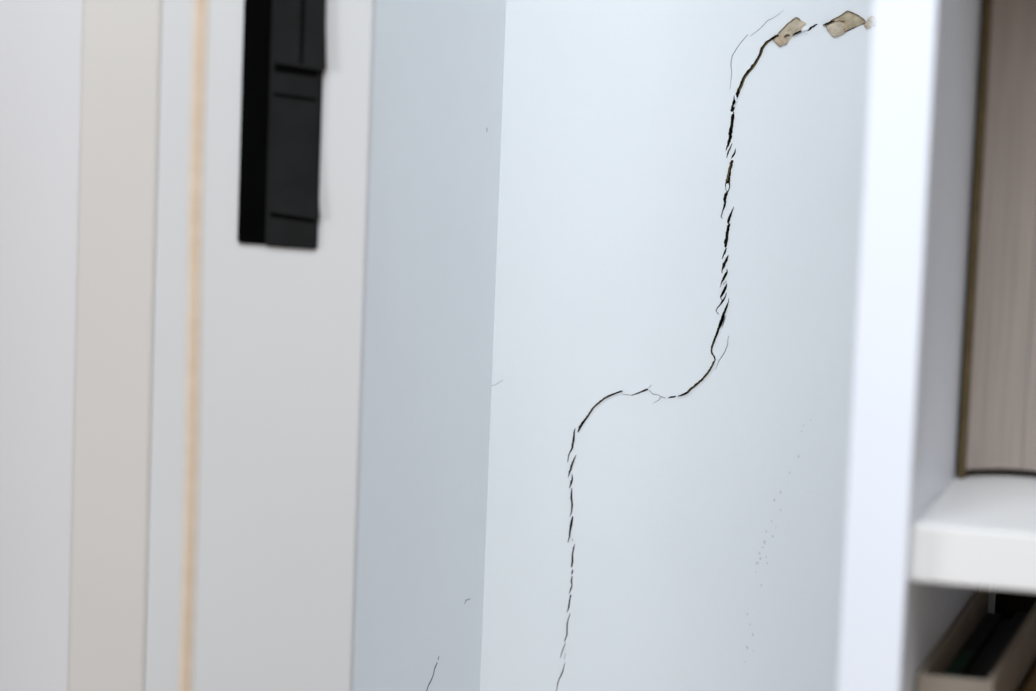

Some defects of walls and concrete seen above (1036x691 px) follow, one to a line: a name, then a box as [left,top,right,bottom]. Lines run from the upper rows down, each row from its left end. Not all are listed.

flaking render [773,17,808,46]
flaking render [825,11,873,37]
crack [556,10,865,691]